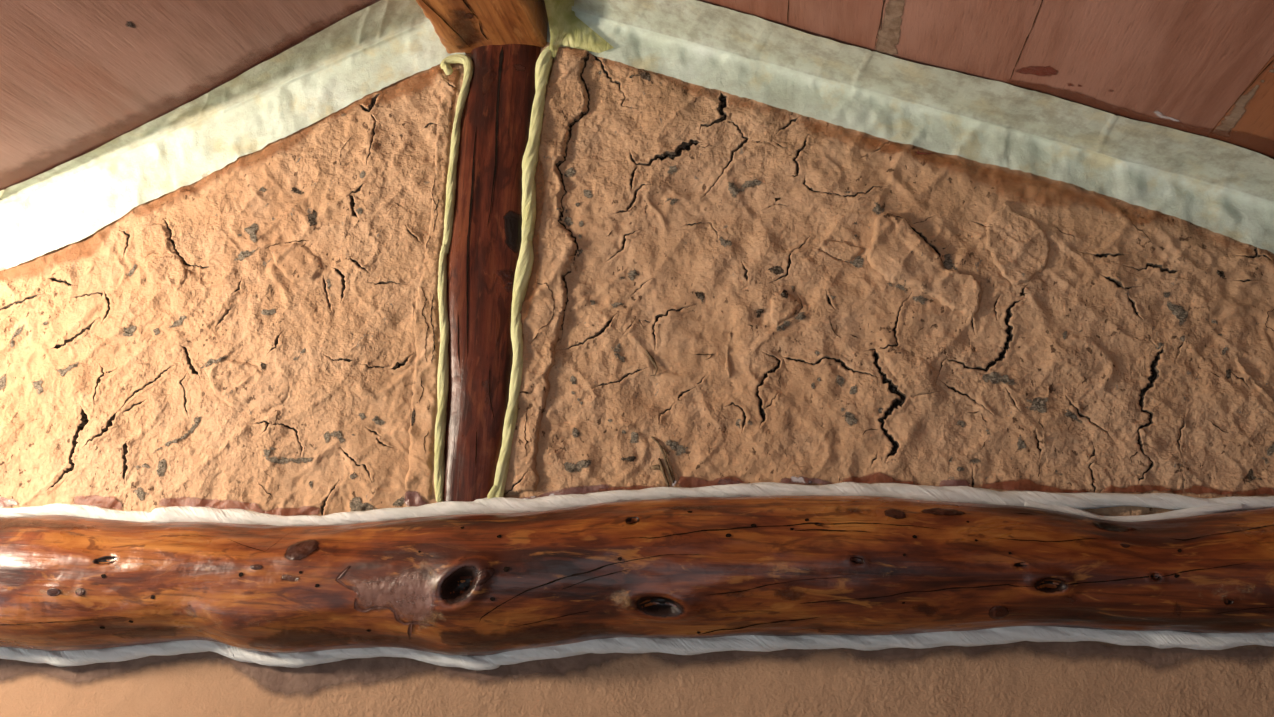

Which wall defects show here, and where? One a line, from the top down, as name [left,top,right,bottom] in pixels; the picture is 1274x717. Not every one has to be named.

crack [420,79,460,132]
crack [0,274,114,353]
crack [118,216,244,329]
crack [266,330,285,356]
crack [317,91,439,516]
crack [532,50,993,391]
crack [655,210,1228,496]
crack [45,343,202,492]
crack [251,416,307,457]